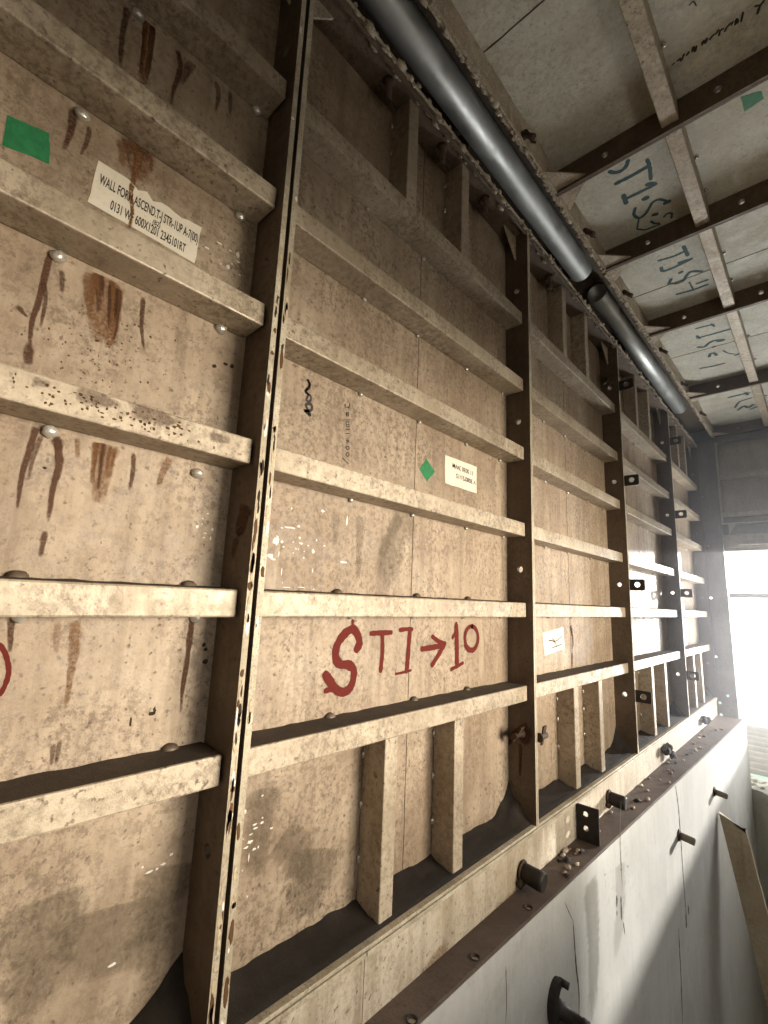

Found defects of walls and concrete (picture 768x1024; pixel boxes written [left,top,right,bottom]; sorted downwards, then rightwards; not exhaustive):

rust [119,8,130,64]
rust [139,21,155,81]
rust [63,110,91,154]
rust [118,140,152,228]
rust [18,253,64,364]
rust [84,274,123,344]
rust [17,428,64,518]
rust [91,443,117,498]
rust [40,532,48,555]
rust [66,624,80,702]
rust [180,622,194,706]
crack [565,903,580,1007]